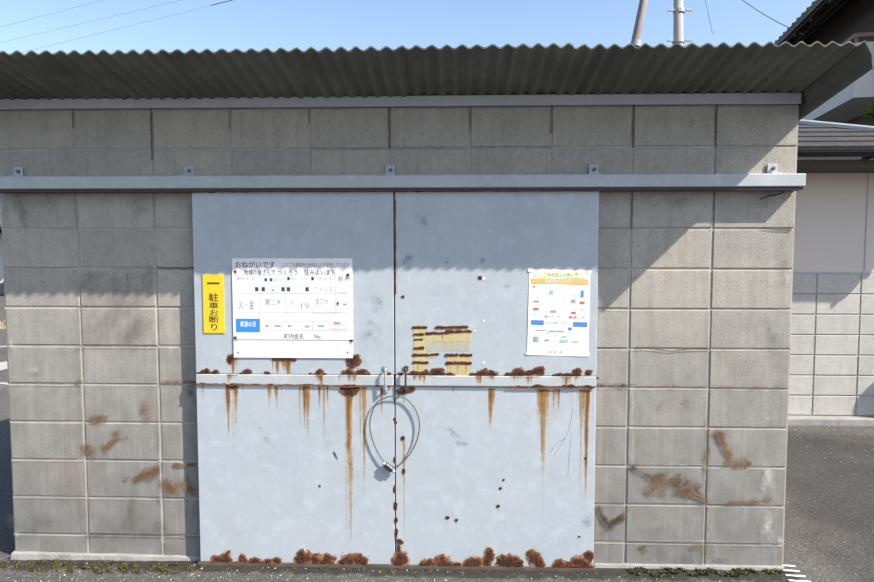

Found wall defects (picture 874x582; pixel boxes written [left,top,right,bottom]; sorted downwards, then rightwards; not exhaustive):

corrosion [90,415,109,423]
corrosion [82,431,126,459]
corrosion [159,353,456,512]
corrosion [706,422,753,471]
corrosion [125,464,196,501]
corrosion [630,465,709,503]
corrosion [204,550,282,564]
corrosion [294,548,369,565]